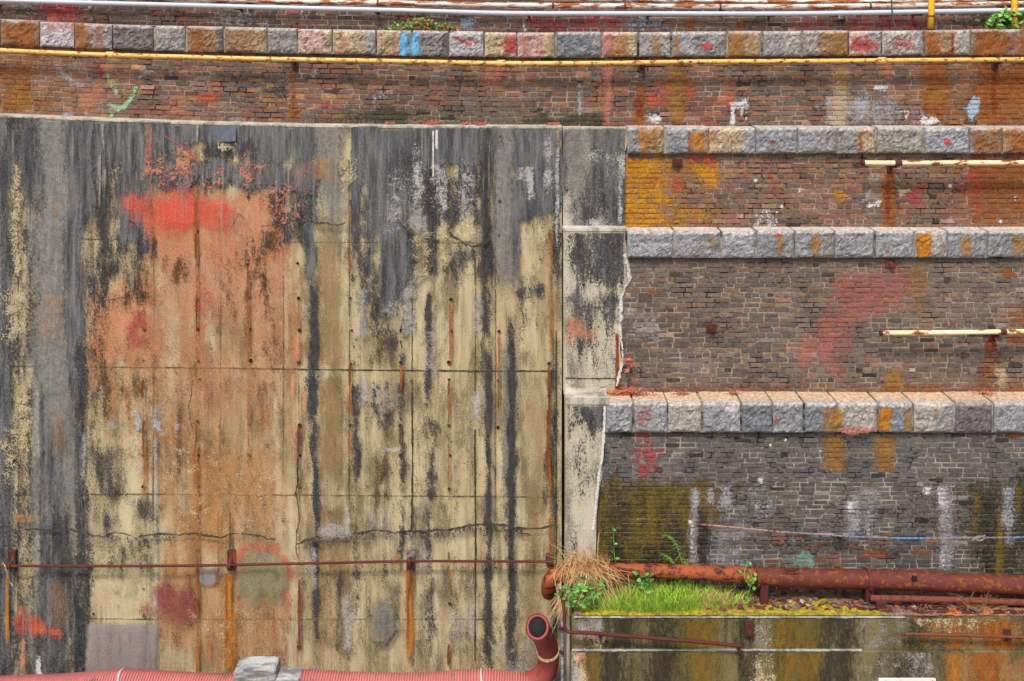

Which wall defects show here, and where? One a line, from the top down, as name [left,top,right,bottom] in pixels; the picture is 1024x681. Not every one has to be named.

peeling [133,142,197,183]
peeling [220,151,314,233]
rust [881,167,898,227]
leakage [0,109,775,681]
rust [193,403,237,672]
crack [0,457,553,558]
leakage [844,488,881,536]
leakage [920,486,954,570]
leakage [972,486,1021,574]
rust [398,556,414,658]
leakage [734,618,903,681]